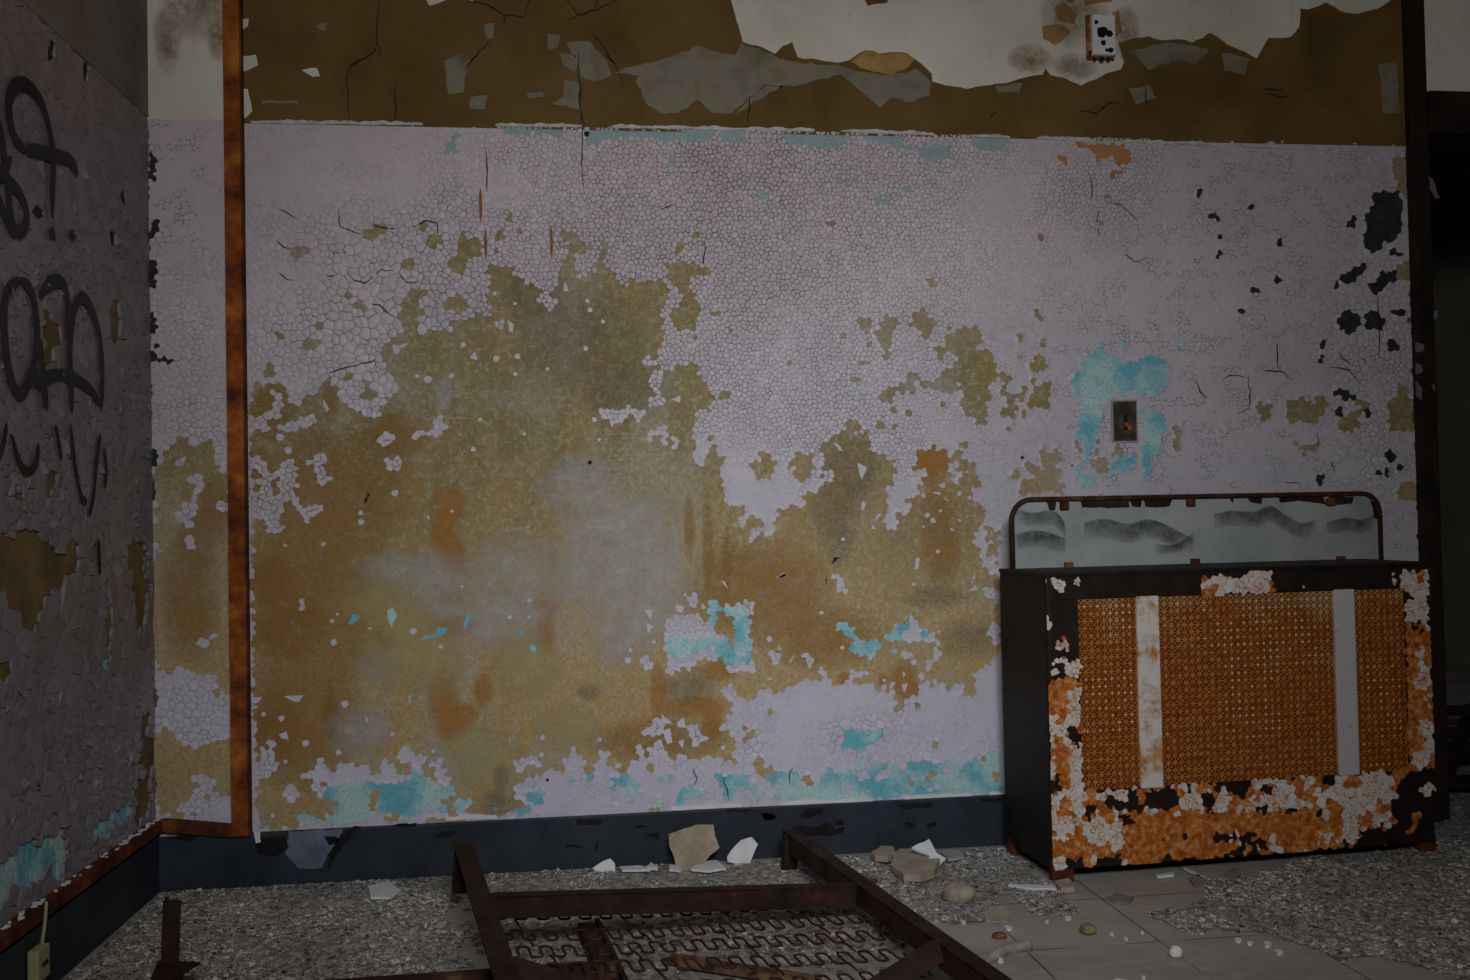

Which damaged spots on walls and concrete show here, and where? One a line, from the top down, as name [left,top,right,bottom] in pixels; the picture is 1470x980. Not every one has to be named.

crack [466,0,530,68]
crack [567,0,623,187]
peeling [31,294,66,396]
peeling [96,280,128,371]
spalling [243,0,1435,507]
peeling [0,459,89,658]
peeling [247,207,1188,872]
peeling [1201,570,1273,596]
peeling [1047,615,1399,871]
peeling [1392,569,1436,797]